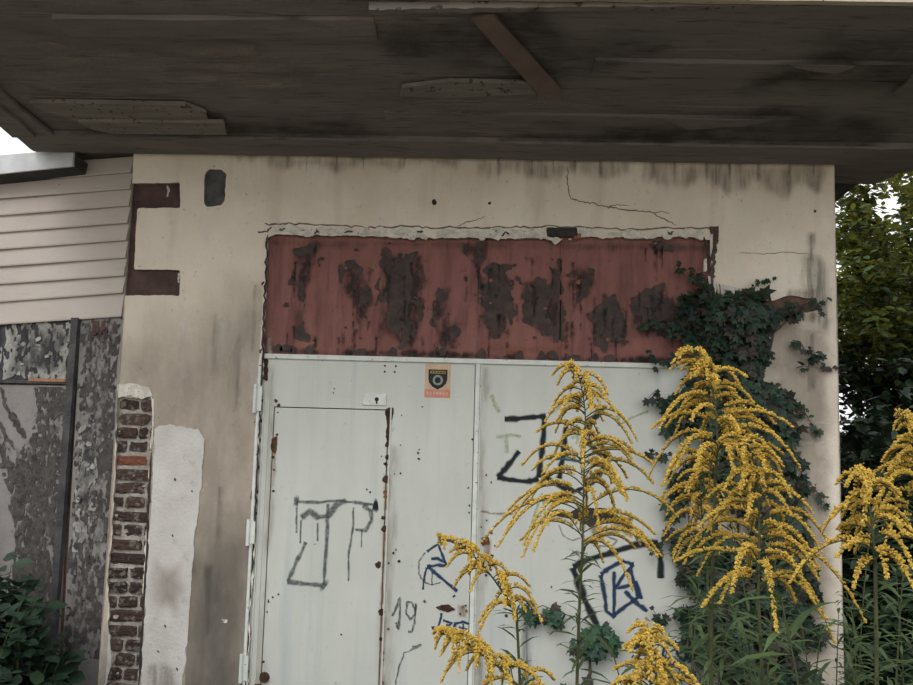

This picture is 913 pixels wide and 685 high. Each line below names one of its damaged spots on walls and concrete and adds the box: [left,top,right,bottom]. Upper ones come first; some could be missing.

crack [566,169,675,225]
flaking render [269,222,710,357]
corrosion [259,433,279,471]
corrosion [381,407,401,499]
flaking render [0,318,205,685]